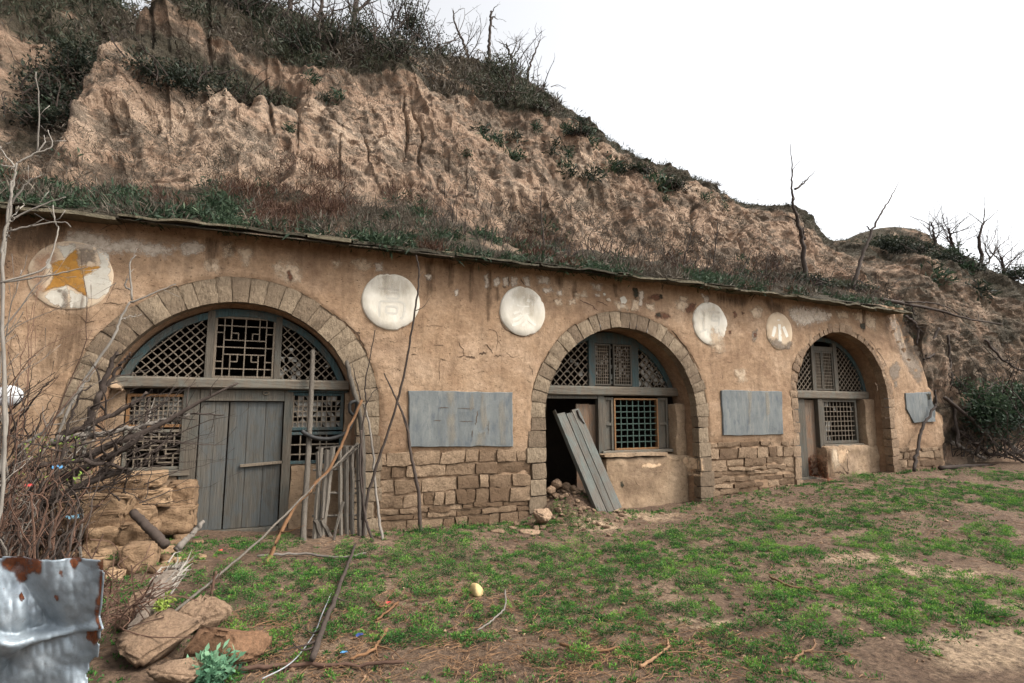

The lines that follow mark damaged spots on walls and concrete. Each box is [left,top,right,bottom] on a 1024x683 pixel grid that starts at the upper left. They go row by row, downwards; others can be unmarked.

peeling [484,274,709,319]
rust [1,556,42,601]
rust [59,557,82,577]
rust [86,559,103,645]